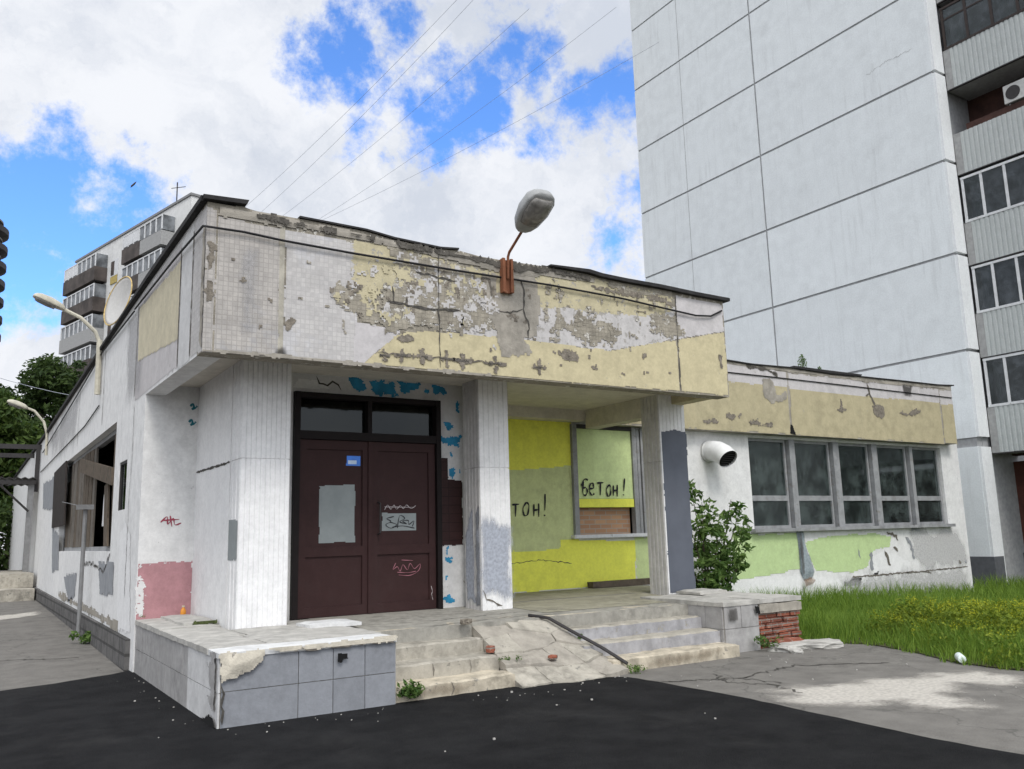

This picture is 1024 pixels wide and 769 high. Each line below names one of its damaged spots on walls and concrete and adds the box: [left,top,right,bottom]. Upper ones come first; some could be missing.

peeling [199,206,686,377]
crack [482,277,530,338]
spalling [718,354,951,404]
spalling [872,404,885,419]
peeling [858,528,967,570]
peeling [134,562,146,616]
spalling [201,648,265,729]
crack [661,662,889,693]